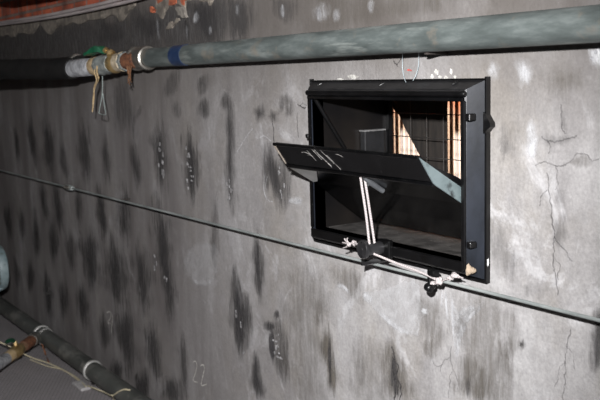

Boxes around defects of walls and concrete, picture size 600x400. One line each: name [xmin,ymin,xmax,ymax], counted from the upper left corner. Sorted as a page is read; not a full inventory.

flaking render [0,0,137,37]
flaking render [150,0,191,29]
damp [185,133,198,202]
damp [264,156,290,199]
damp [137,211,174,312]
damp [231,270,251,354]
damp [101,317,134,377]
damp [266,323,288,372]